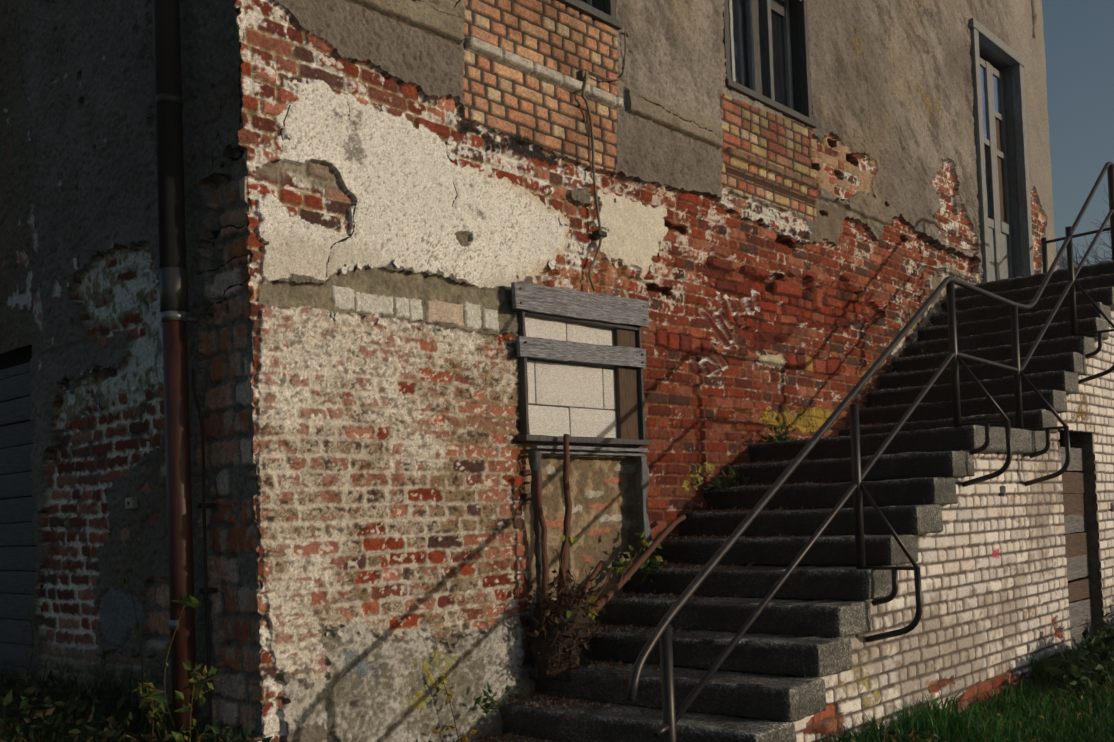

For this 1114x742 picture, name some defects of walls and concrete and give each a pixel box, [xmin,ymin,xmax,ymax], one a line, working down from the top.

spalling [0,200,171,706]
peeling [192,0,983,742]